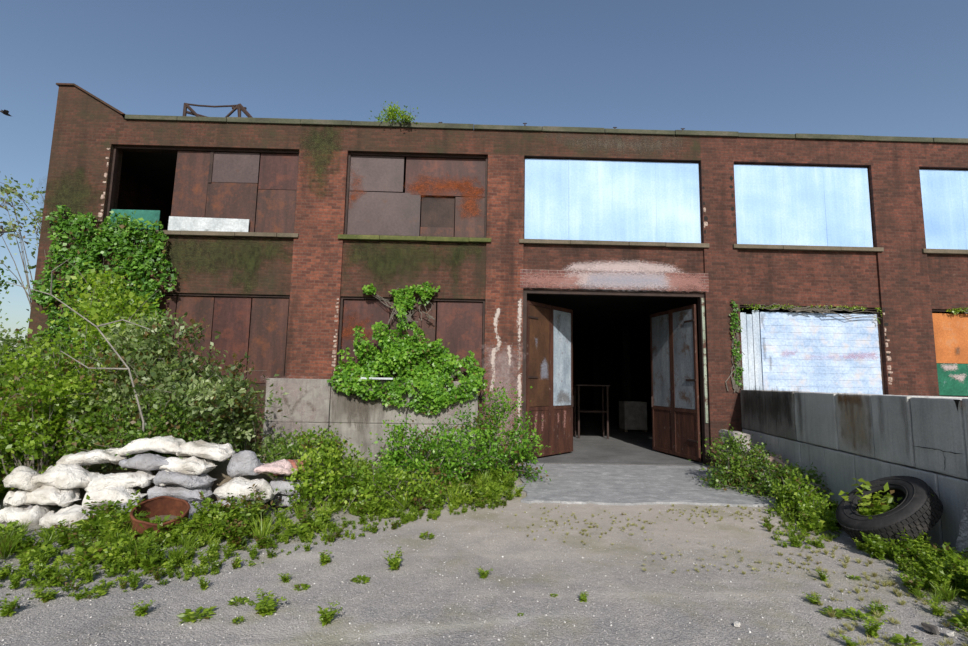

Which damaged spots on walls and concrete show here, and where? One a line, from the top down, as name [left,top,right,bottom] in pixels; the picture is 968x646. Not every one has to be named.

peeling [523,260,705,291]
leakage [490,308,511,391]